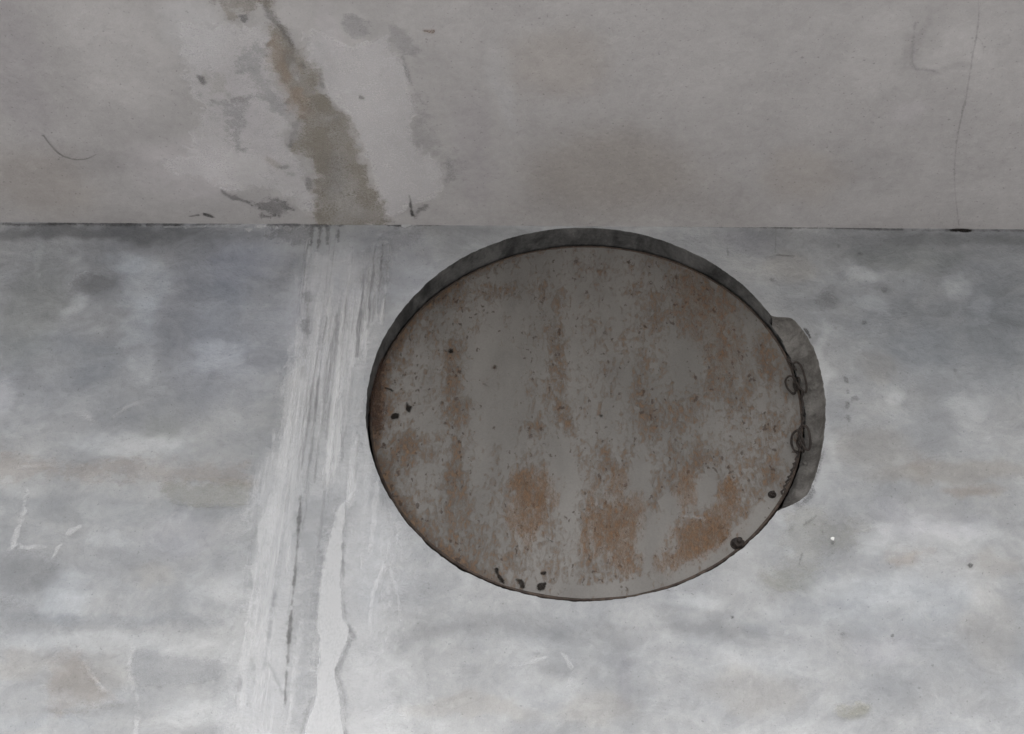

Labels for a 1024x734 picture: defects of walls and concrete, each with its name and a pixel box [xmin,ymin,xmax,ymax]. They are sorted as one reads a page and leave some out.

rust [369,359,386,435]
water stain [306,503,349,734]